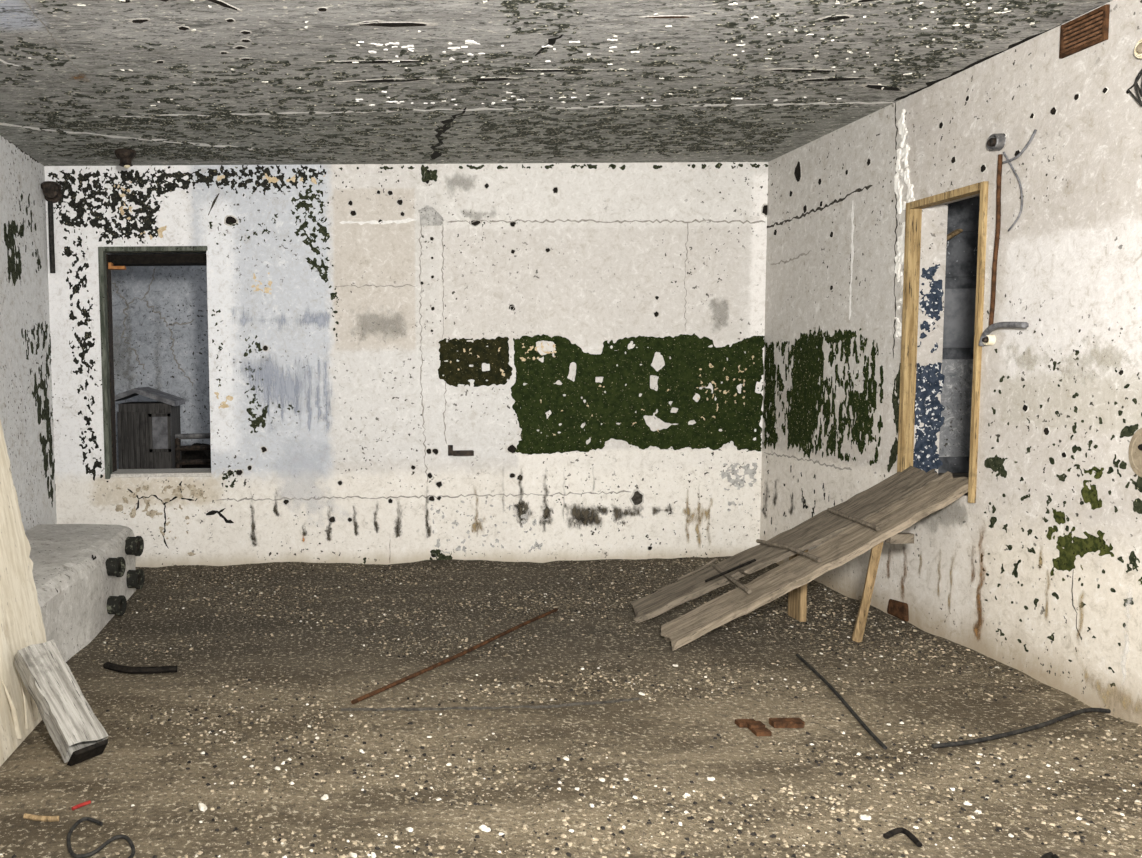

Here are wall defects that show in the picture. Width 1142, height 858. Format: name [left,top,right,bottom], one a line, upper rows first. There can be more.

crack [0,24,1062,548]
peeling [0,0,1064,539]
peeling [1097,569,1134,607]
peeling [1117,551,1142,585]